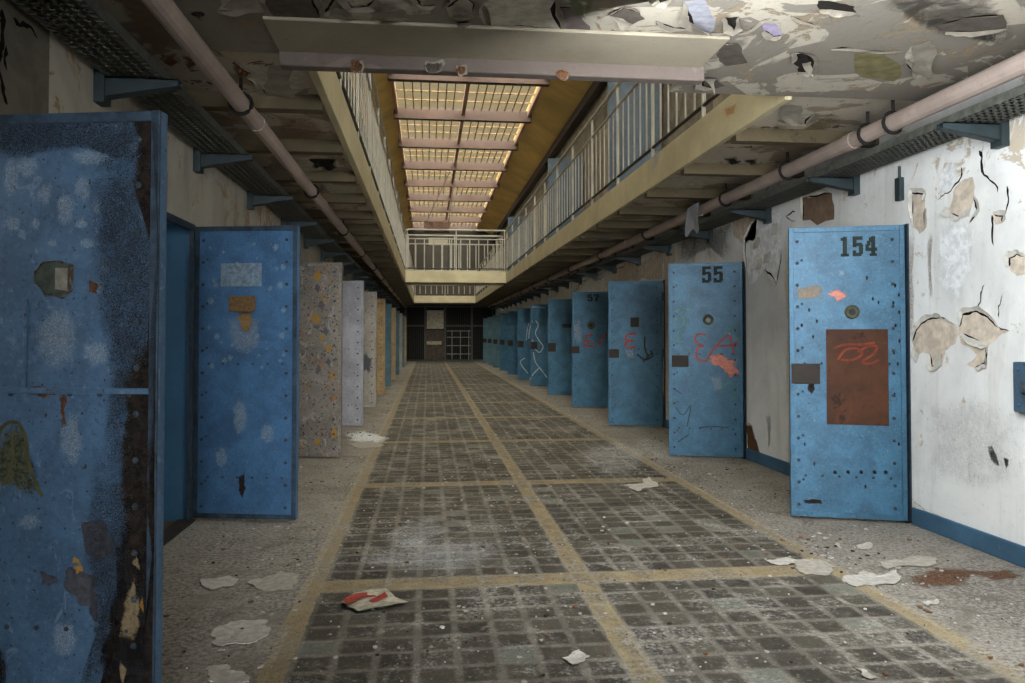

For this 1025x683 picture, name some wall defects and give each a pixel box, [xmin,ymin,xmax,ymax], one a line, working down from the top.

peeling [608,0,747,66]
peeling [762,23,782,41]
peeling [817,1,857,18]
peeling [935,14,1007,37]
crack [0,9,38,104]
peeling [791,52,818,78]
peeling [854,41,937,81]
peeling [695,77,725,94]
peeling [800,189,834,225]
peeling [939,177,979,223]
peeling [992,210,1006,225]
peeling [910,306,1008,371]